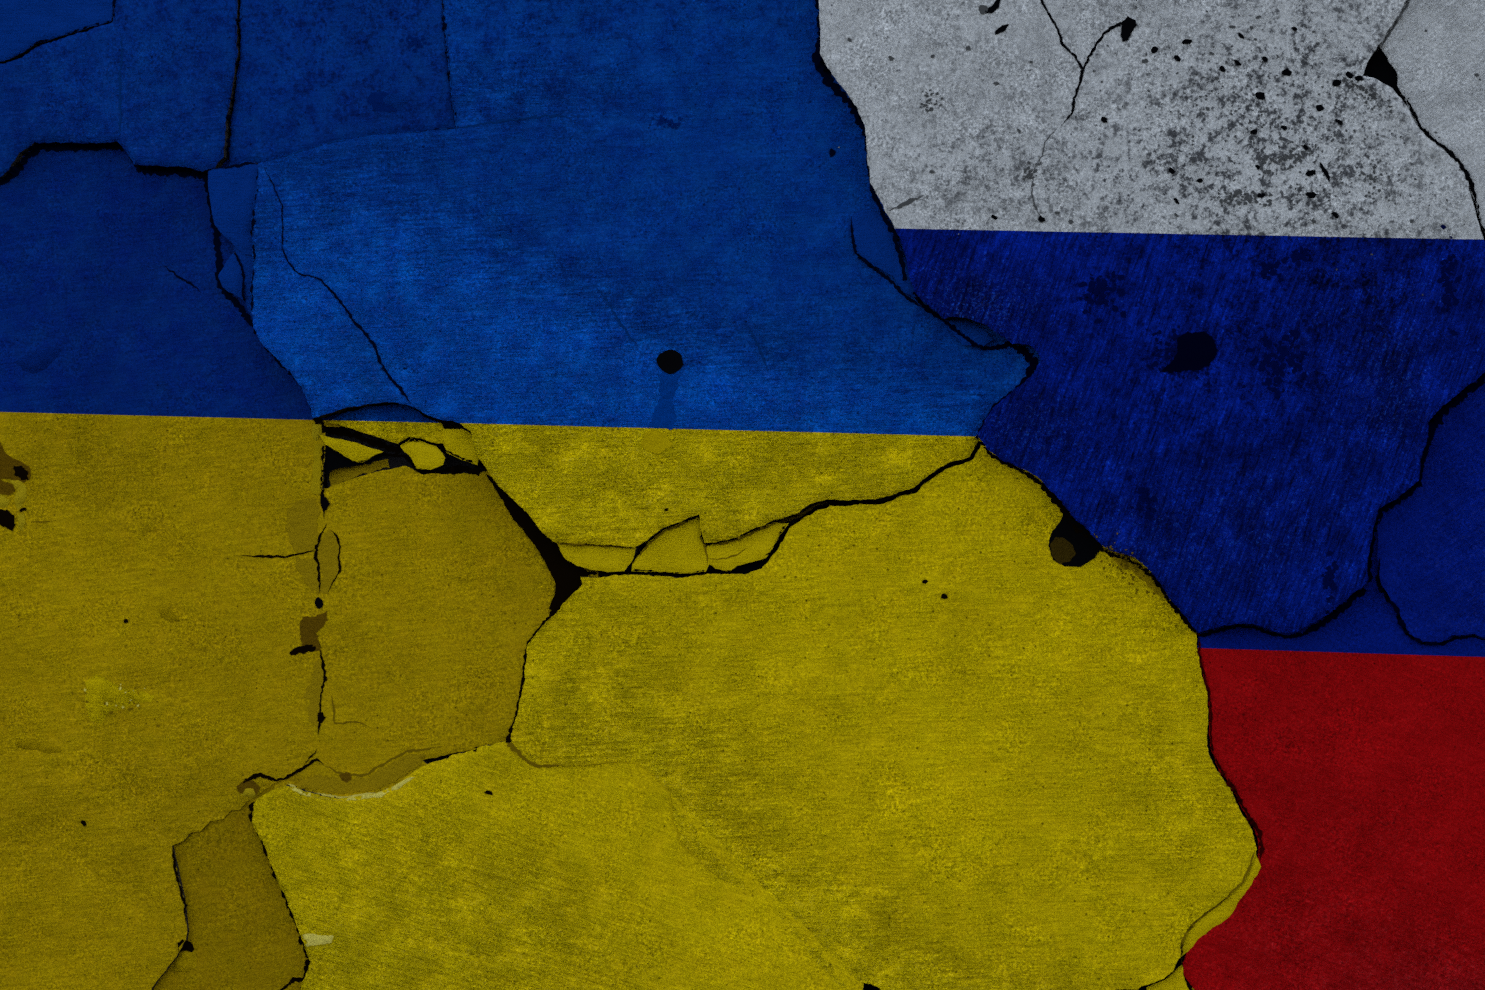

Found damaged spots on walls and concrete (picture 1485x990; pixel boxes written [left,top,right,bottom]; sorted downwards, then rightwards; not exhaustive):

crack [172,846,187,921]
crack [0,0,574,592]
crack [243,643,433,990]
flaking render [0,143,791,990]
crack [506,0,1485,990]